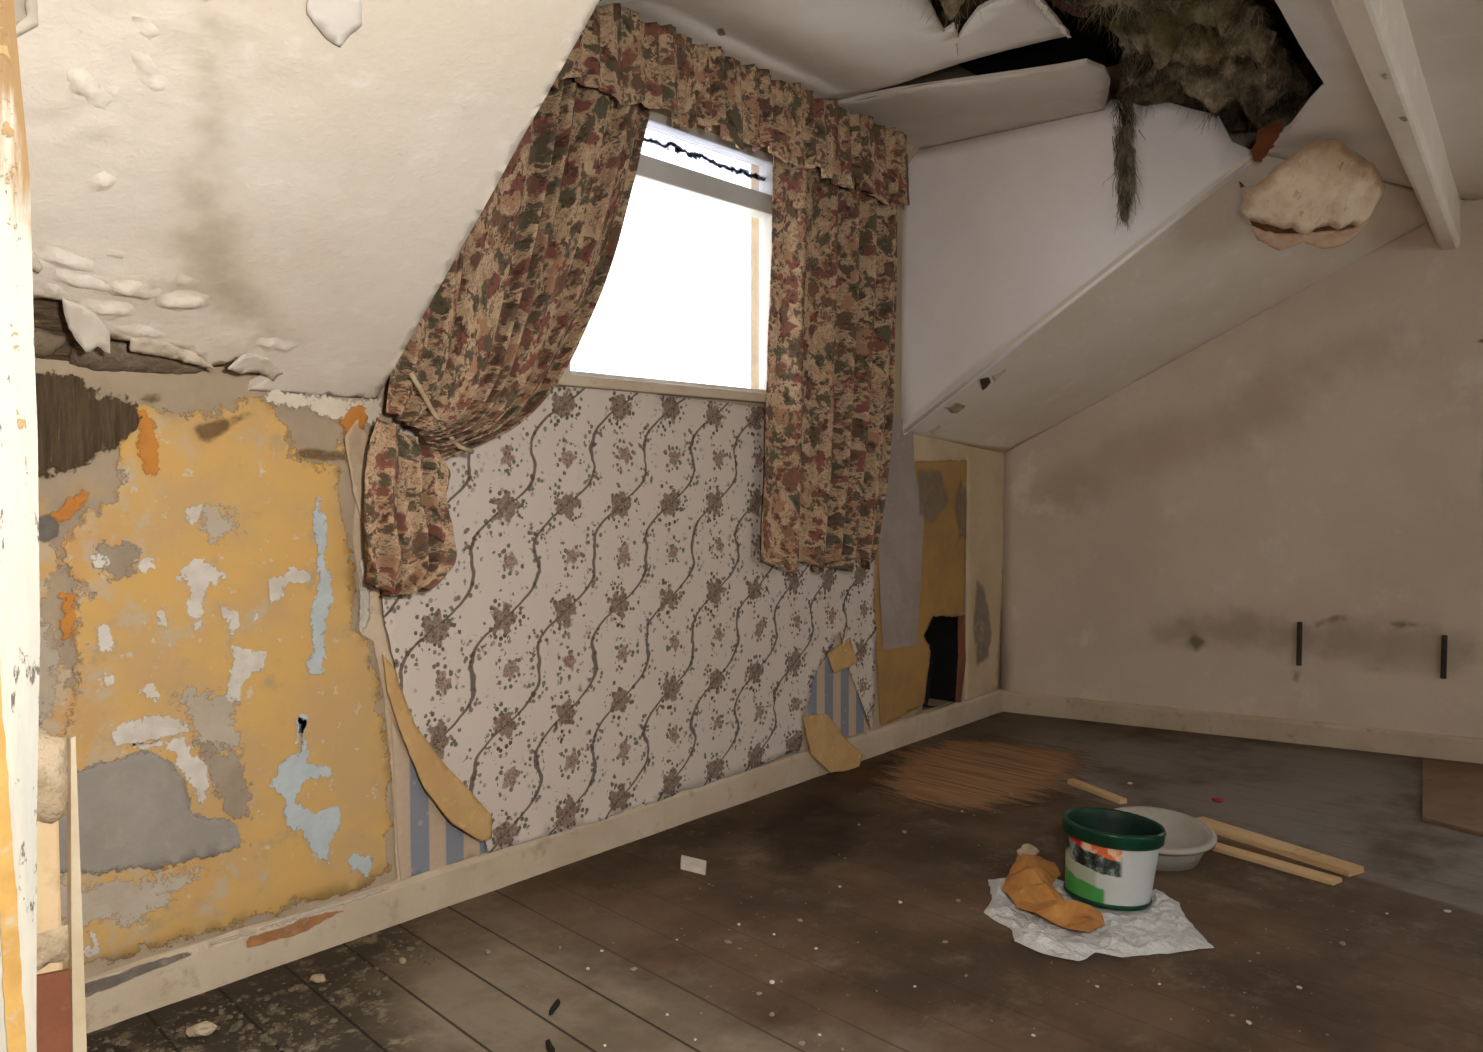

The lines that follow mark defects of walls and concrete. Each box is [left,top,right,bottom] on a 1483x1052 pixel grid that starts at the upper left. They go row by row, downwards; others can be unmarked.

peeling [14,0,38,38]
peeling [307,0,362,47]
peeling [32,251,43,274]
spalling [980,369,1006,390]
peeling [874,403,967,726]
peeling [33,298,394,971]